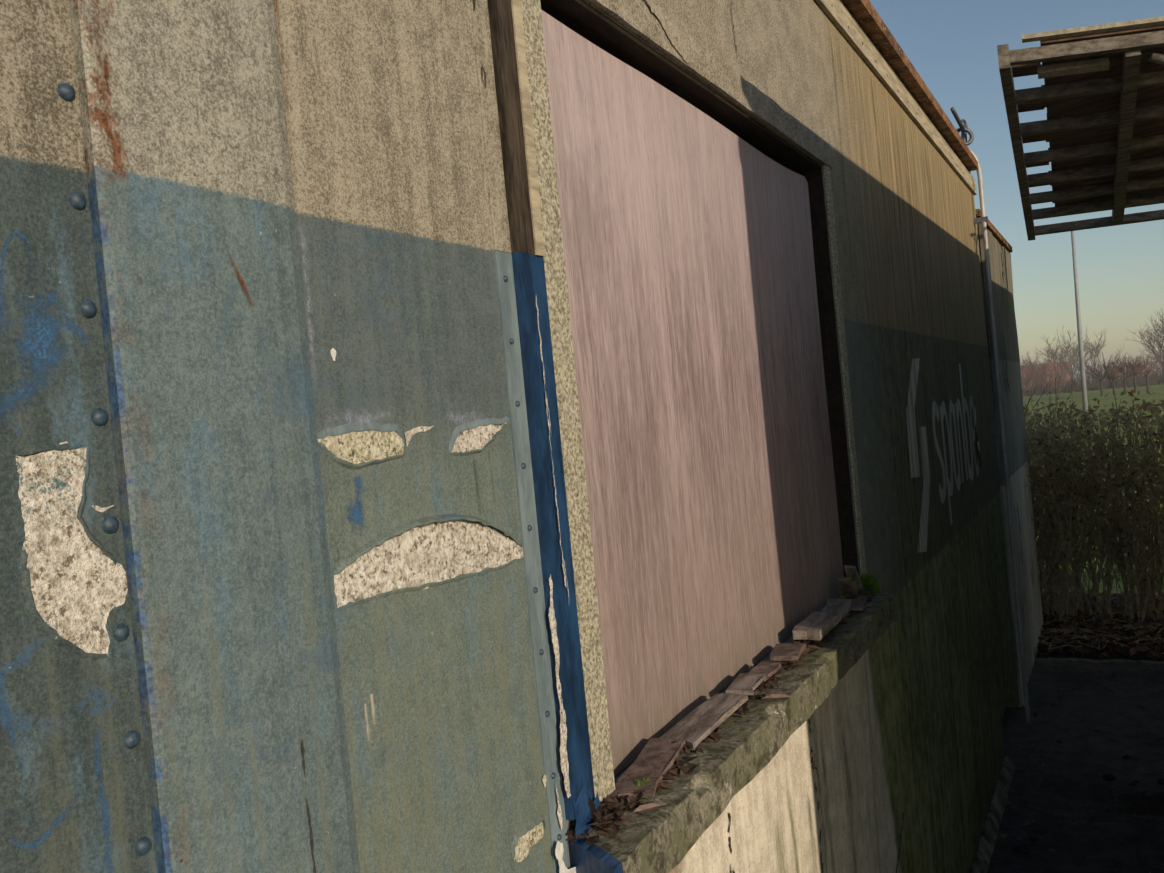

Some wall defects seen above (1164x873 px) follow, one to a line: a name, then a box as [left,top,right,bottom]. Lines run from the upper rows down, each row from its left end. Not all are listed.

peeling [317,412,433,469]
peeling [449,413,510,457]
peeling [15,440,128,659]
peeling [333,513,524,611]
peeling [511,574,620,873]
crack [808,718,823,872]